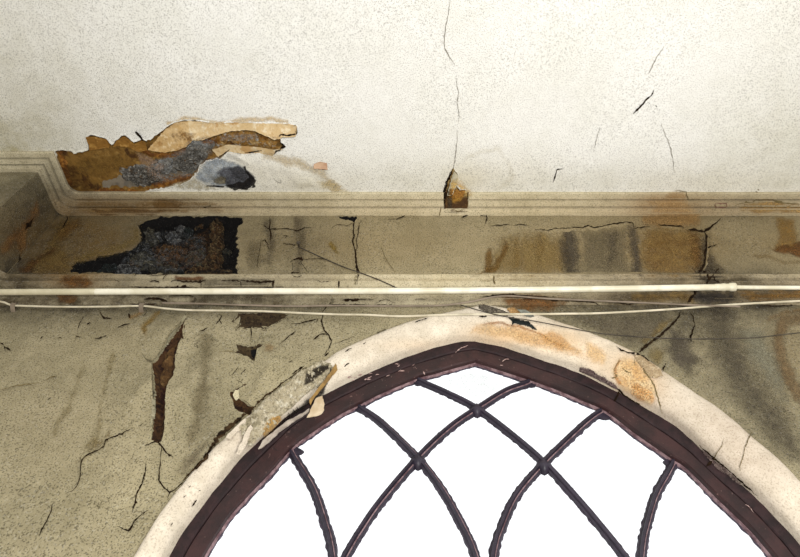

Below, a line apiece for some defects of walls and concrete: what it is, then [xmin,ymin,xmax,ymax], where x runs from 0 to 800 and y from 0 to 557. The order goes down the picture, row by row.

crack [633,47,674,168]
peeling [53,119,299,192]
flaking render [443,166,469,212]
flaking render [68,215,245,275]
crack [118,221,392,357]
rust [481,236,565,274]
damp [586,229,641,275]
crack [439,189,798,412]
flaking render [149,311,190,445]
flaking render [226,343,349,455]
rust [615,361,654,403]
crack [699,432,757,496]